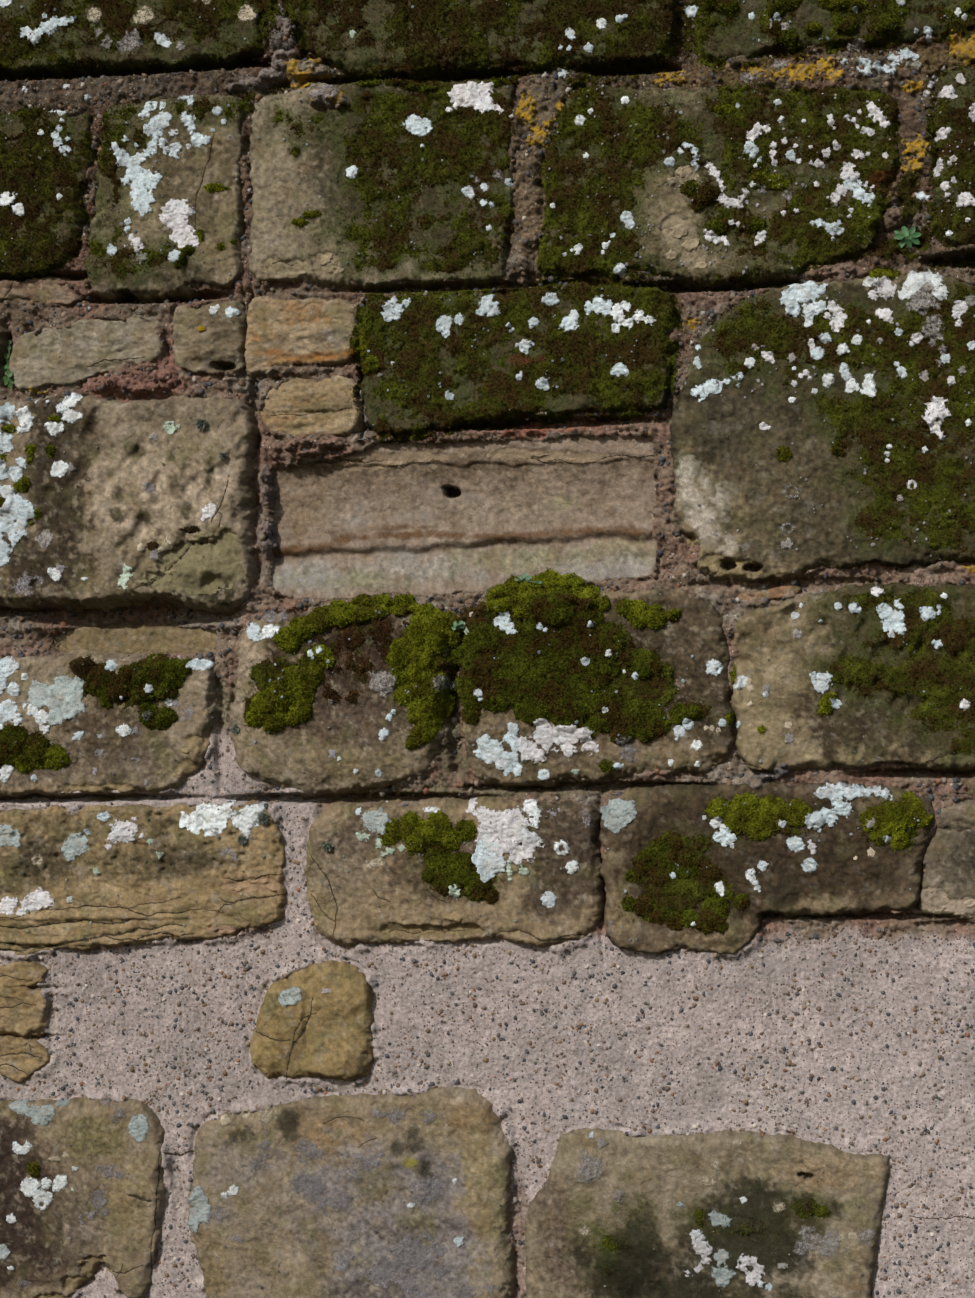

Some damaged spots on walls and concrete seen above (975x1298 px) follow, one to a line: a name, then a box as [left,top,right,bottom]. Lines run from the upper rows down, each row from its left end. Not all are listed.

crack [255,997,316,1080]